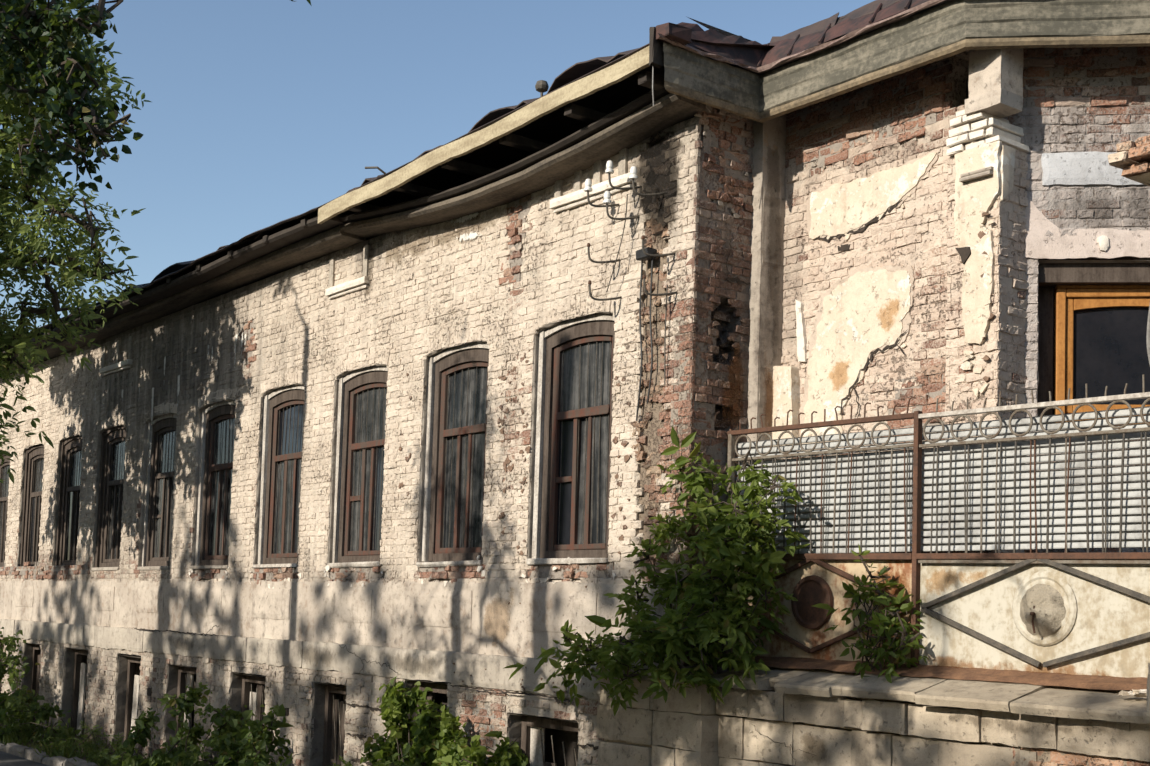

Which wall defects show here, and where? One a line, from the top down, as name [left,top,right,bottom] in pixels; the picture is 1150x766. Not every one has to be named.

spalling [1023,46,1150,108]
spalling [785,59,952,251]
spalling [498,194,533,296]
peeling [953,140,1015,397]
spalling [238,317,257,369]
peeling [772,265,915,451]
crack [839,329,908,417]
spalling [883,363,946,444]